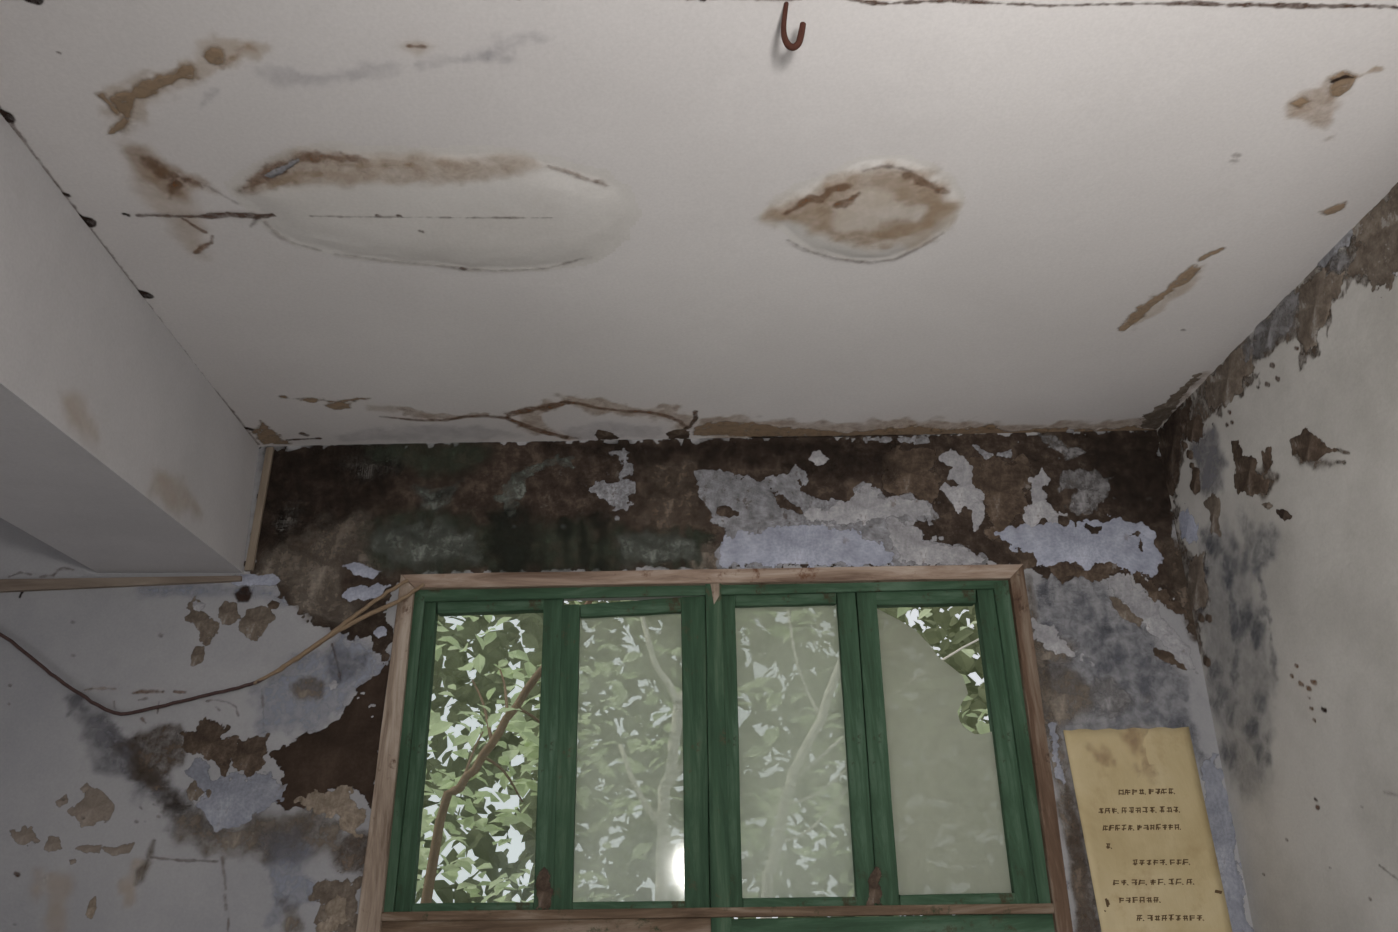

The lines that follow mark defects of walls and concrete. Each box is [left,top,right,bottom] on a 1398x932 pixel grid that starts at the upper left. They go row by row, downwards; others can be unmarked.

crack [25,0,43,8]
crack [855,0,1398,9]
peeling [97,47,225,134]
peeling [1291,97,1309,110]
peeling [1327,71,1356,102]
water stain [370,505,708,574]
spalling [120,182,1398,932]
water stain [72,696,309,862]
peeling [55,783,115,828]
peeling [10,825,135,865]